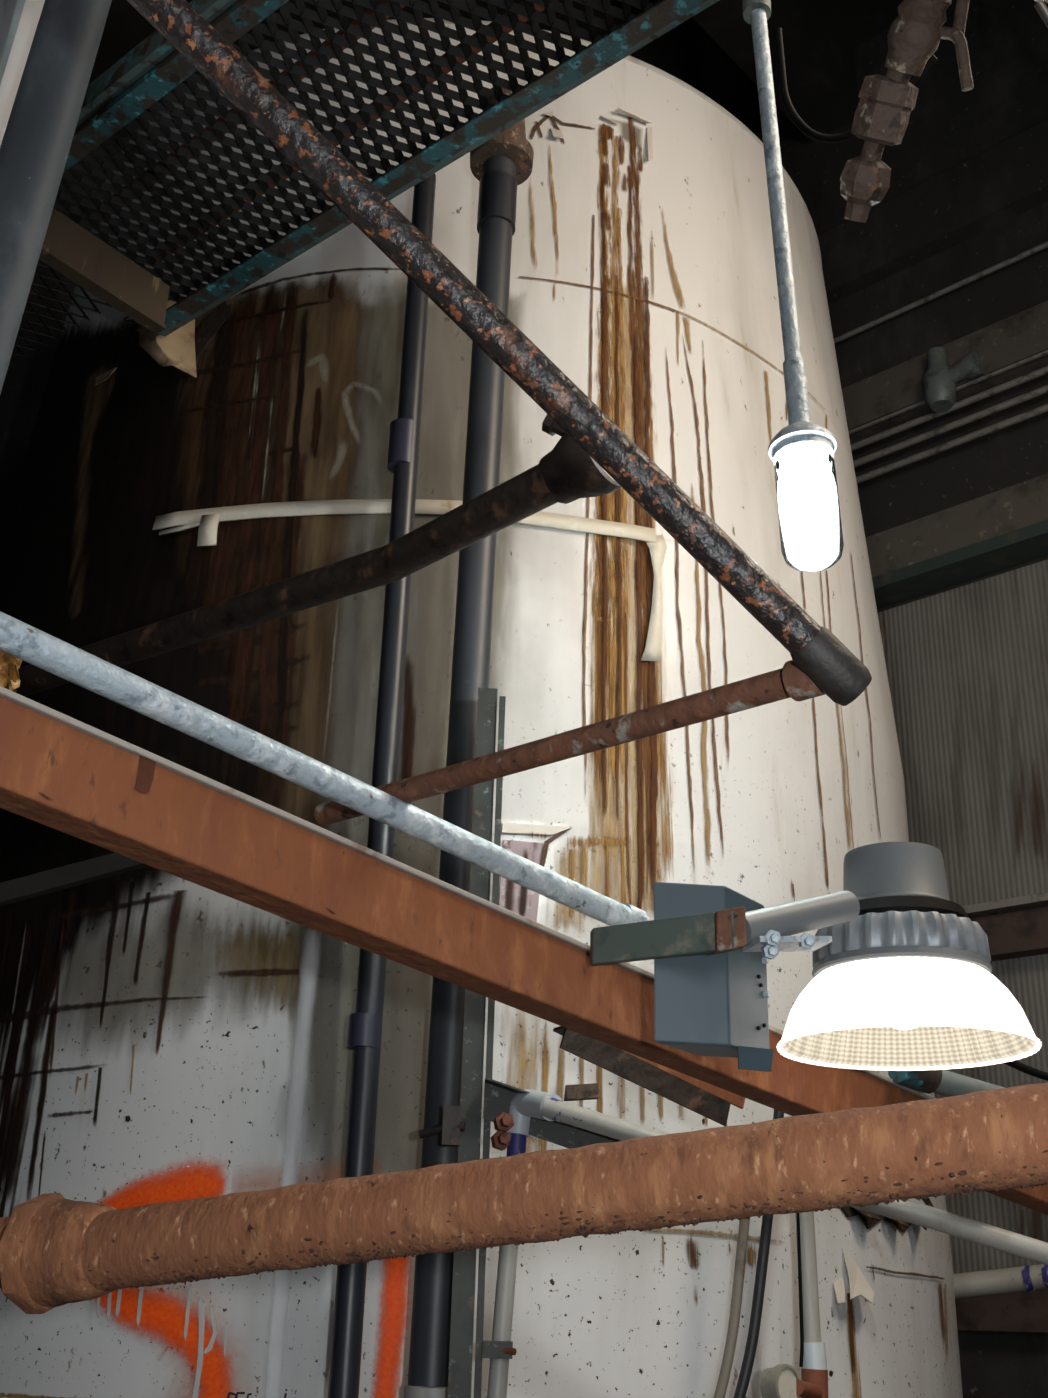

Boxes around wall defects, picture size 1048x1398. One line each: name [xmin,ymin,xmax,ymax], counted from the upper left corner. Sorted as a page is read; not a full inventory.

damp [173,267,406,612]
damp [414,303,472,530]
rust [519,117,787,522]
damp [324,585,386,785]
damp [398,551,459,781]
rust [556,903,585,926]
rust [560,733,673,911]
rust [582,487,662,726]
rust [675,540,728,697]
rust [685,715,729,867]
damp [0,874,200,1198]
damp [373,958,433,1174]